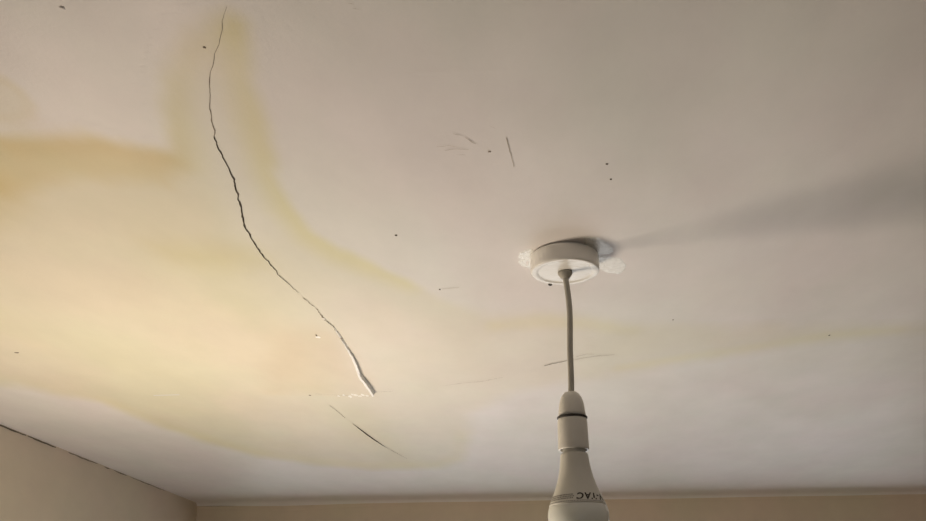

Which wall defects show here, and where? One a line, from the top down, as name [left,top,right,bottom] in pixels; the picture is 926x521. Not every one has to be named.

damp [0,0,568,472]
crack [209,10,396,453]
damp [572,307,926,385]